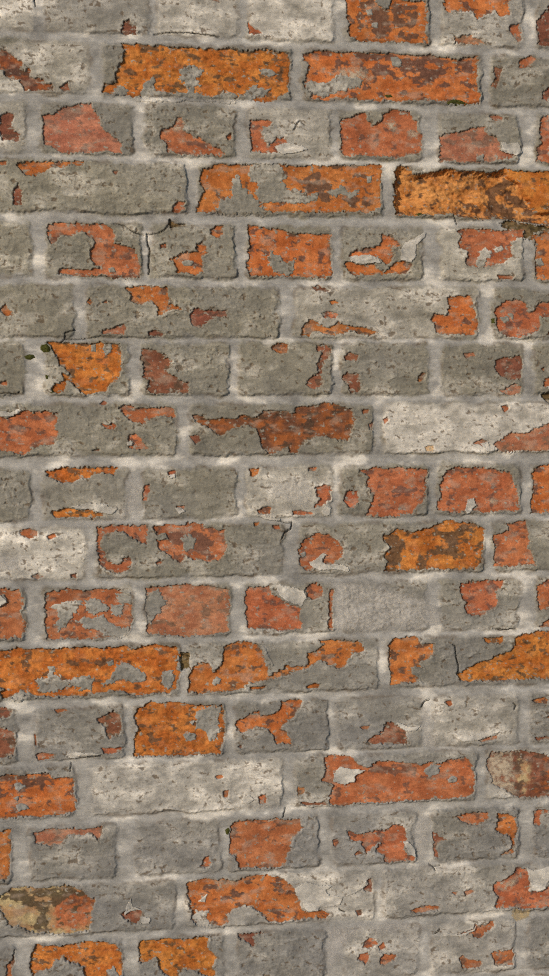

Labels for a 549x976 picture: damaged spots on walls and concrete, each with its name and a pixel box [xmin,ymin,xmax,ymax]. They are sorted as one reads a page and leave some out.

peeling [102,19,290,105]
peeling [0,103,122,205]
peeling [160,0,549,394]
peeling [47,222,227,328]
peeling [190,402,388,454]
peeling [51,502,227,573]
peeling [343,464,549,617]
peeling [0,573,364,758]
peeling [456,579,549,682]
peeling [297,754,475,806]
peeling [0,710,123,976]
peeling [138,817,372,976]